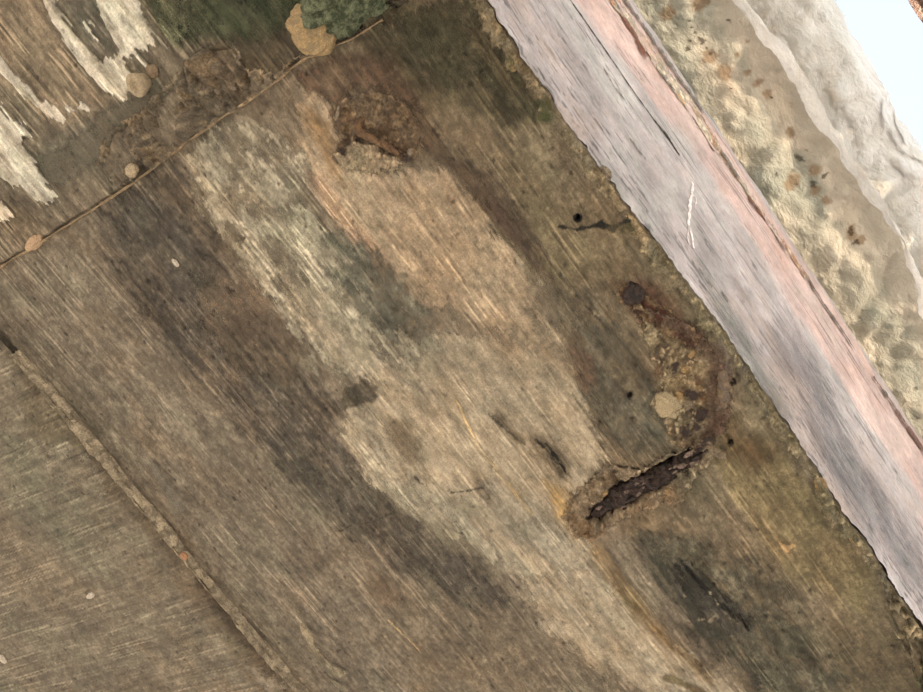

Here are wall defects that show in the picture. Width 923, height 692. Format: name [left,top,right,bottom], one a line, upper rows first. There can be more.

leakage [41,440,107,497]
spalling [328,88,426,176]
leakage [88,52,847,692]
spalling [475,0,896,598]